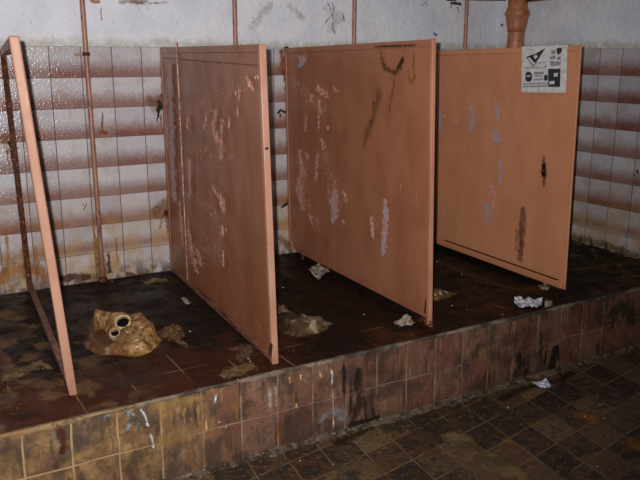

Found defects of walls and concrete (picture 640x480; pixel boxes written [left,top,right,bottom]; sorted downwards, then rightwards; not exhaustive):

peeling [201,89,241,160]
peeling [294,78,348,238]
peeling [212,185,228,215]
peeling [364,198,389,256]
water stain [6,302,56,325]
water stain [64,291,167,339]
water stain [342,365,352,414]